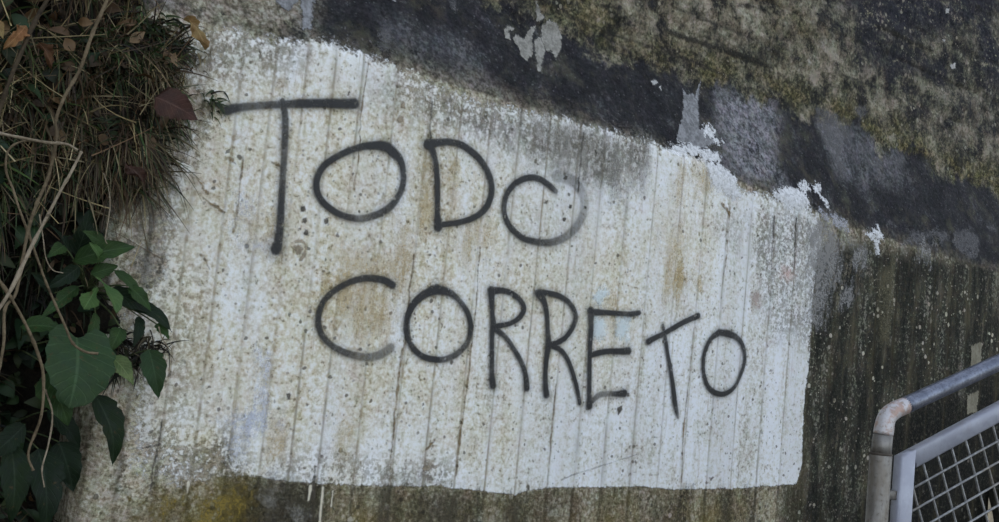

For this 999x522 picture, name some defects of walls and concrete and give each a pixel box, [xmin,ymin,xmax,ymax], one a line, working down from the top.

peeling [504,1,562,72]
peeling [676,80,716,148]
damp [670,123,743,201]
damp [772,180,850,232]
damp [863,224,884,255]
damp [967,390,979,414]